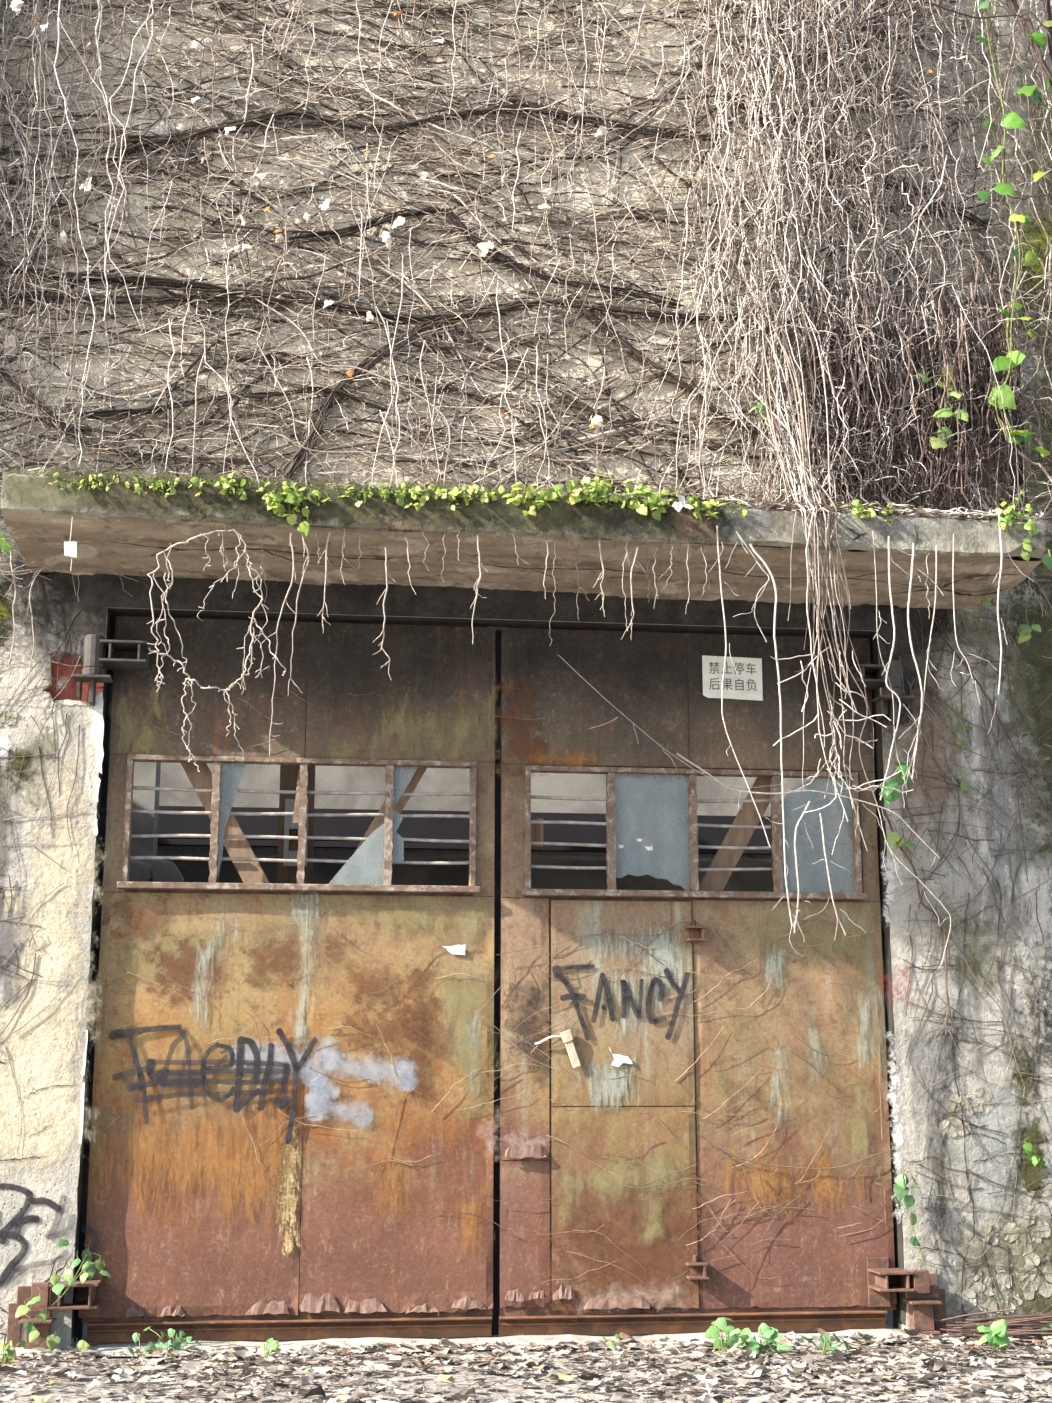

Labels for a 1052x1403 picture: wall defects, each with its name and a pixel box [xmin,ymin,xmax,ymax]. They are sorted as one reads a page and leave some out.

damp [957,670,1052,944]
corrosion [102,895,227,1006]
corrosion [239,933,457,1102]
corrosion [93,1110,302,1255]
peeling [246,1292,387,1315]
peeling [405,1295,486,1316]
peeling [505,1143,546,1159]
peeling [505,1283,650,1310]
corrosion [537,1170,707,1323]
damp [932,1142,947,1228]
damp [938,1029,1020,1209]
crack [906,1033,1052,1320]